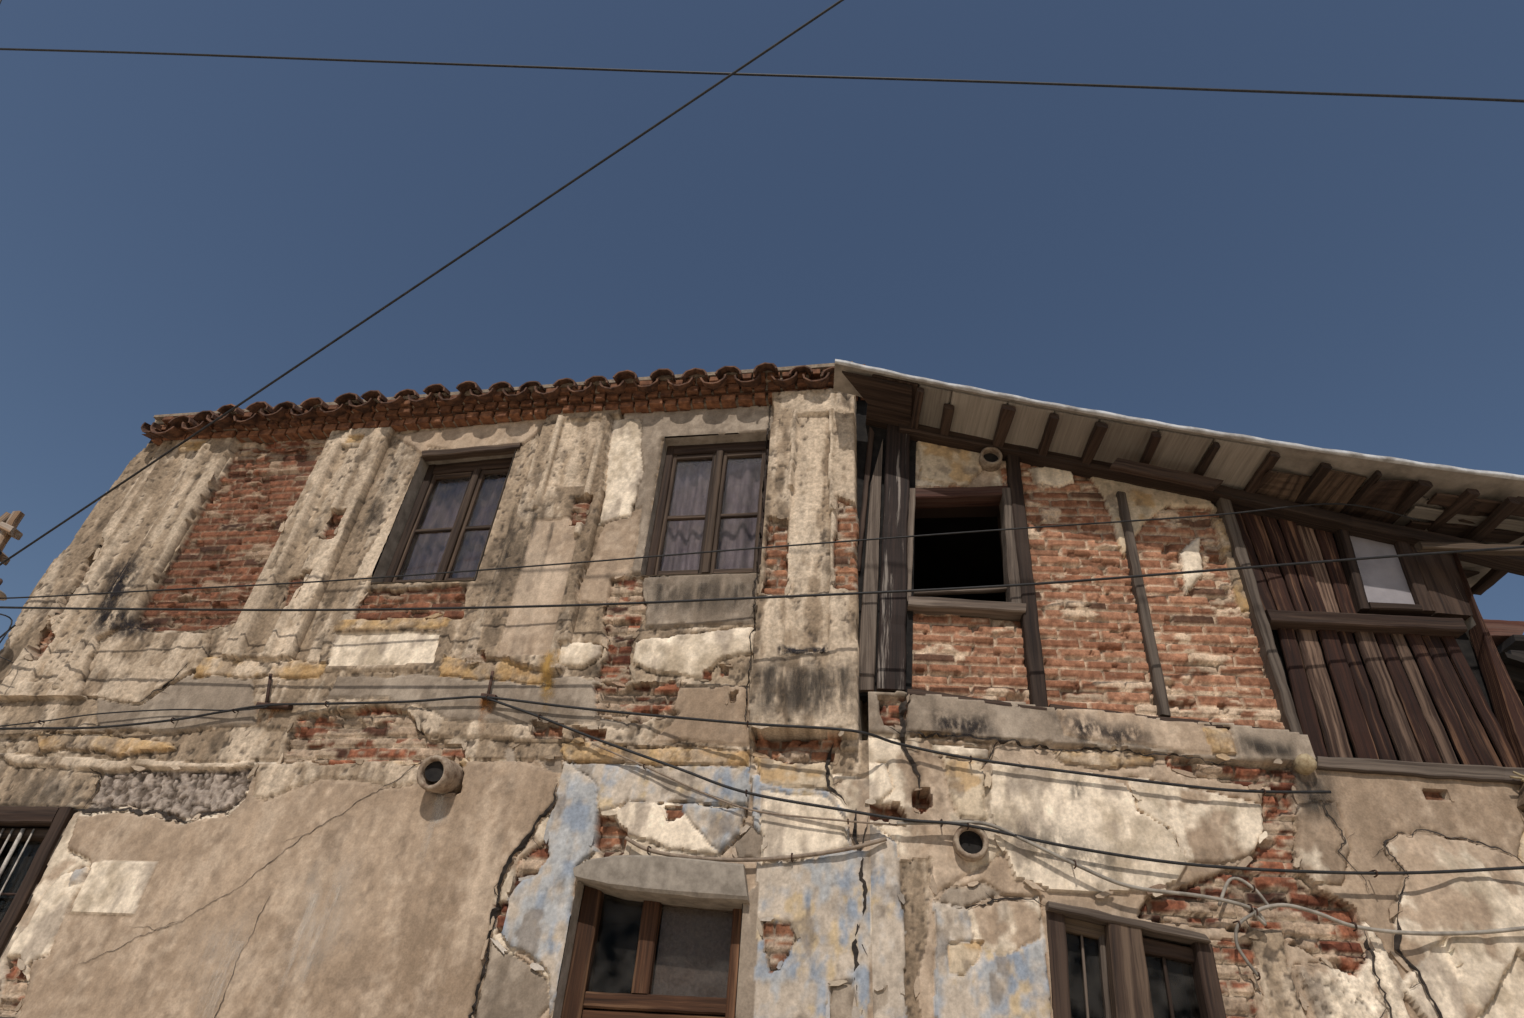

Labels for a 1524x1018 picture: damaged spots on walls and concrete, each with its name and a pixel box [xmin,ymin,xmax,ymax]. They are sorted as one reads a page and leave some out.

peeling [569,414,644,526]
leakage [98,560,155,635]
flaking render [38,731,259,821]
peeling [82,438,1411,1018]
leakage [762,668,845,710]
peeling [0,867,90,1017]
crack [468,783,558,1018]
crack [1324,804,1521,1018]